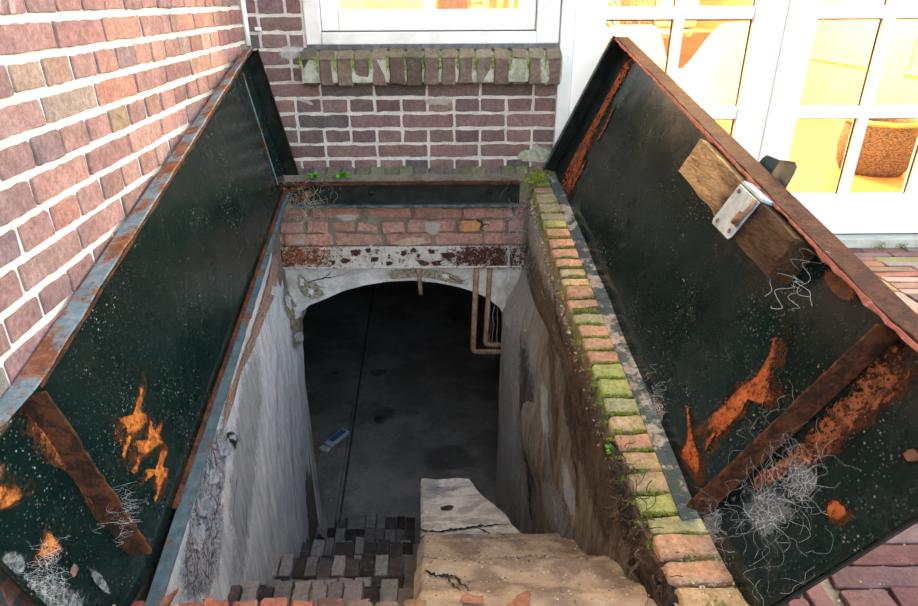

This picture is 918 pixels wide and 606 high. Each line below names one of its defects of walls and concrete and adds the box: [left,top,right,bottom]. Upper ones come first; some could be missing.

corrosion [560,56,635,201]
corrosion [281,243,528,270]
corrosion [0,464,38,510]
corrosion [27,524,65,568]
corrosion [18,408,105,527]
corrosion [113,371,170,504]
flaking render [180,249,324,602]
crack [424,569,478,593]
crack [419,524,509,534]
corrosion [675,324,797,489]
corrosion [748,338,918,496]
corrosion [824,498,855,530]